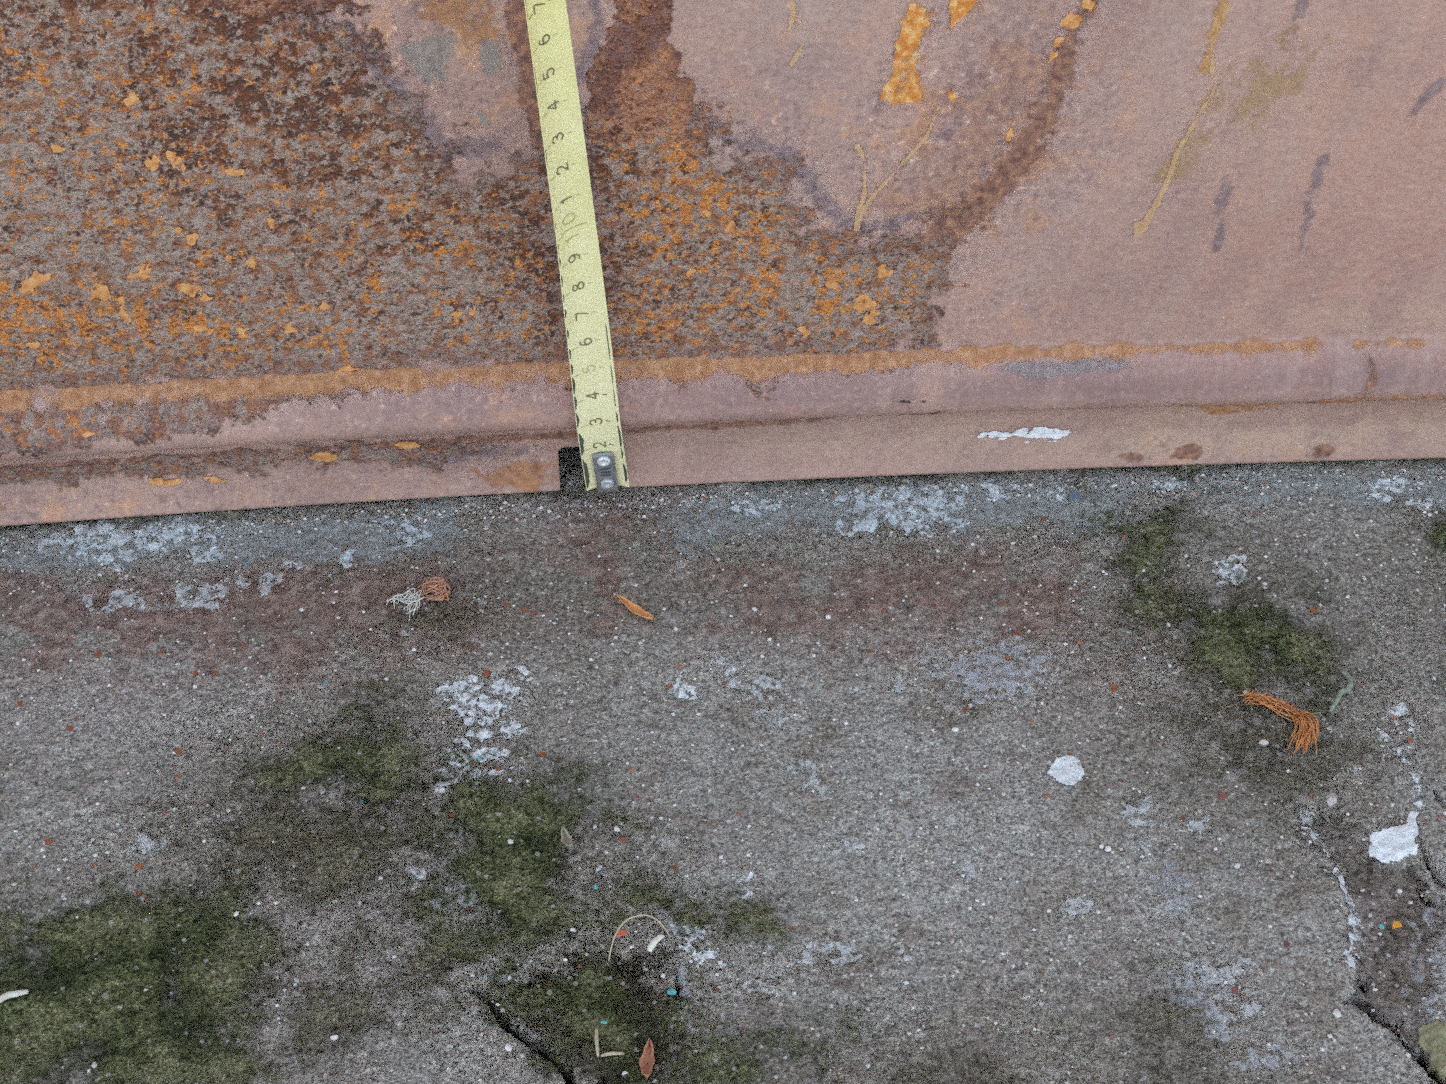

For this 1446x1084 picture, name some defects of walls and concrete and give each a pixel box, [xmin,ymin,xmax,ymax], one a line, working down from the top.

corrosion [580,0,1324,401]
corrosion [0,0,578,490]
corrosion [1306,337,1445,404]
corrosion [622,417,833,434]
corrosion [1172,444,1202,459]
water stain [1212,554,1248,586]
water stain [701,652,789,728]
water stain [435,665,529,793]
water stain [664,920,733,1039]
water stain [798,941,862,970]
crack [467,990,573,1084]
crack [1417,1061,1437,1083]